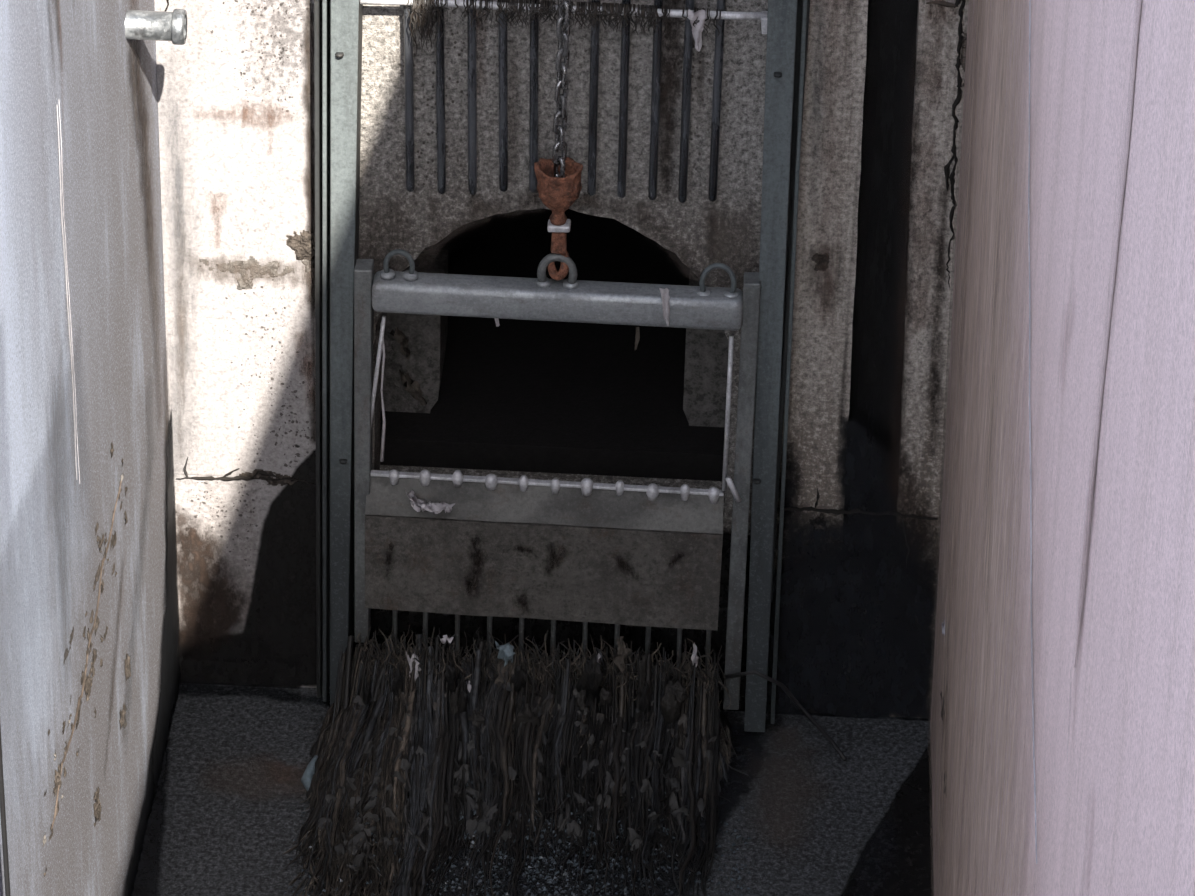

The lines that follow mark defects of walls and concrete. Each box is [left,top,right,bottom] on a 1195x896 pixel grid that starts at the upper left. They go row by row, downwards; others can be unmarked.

leakage [125,0,330,896]
leakage [352,0,1022,896]
crack [944,0,967,288]